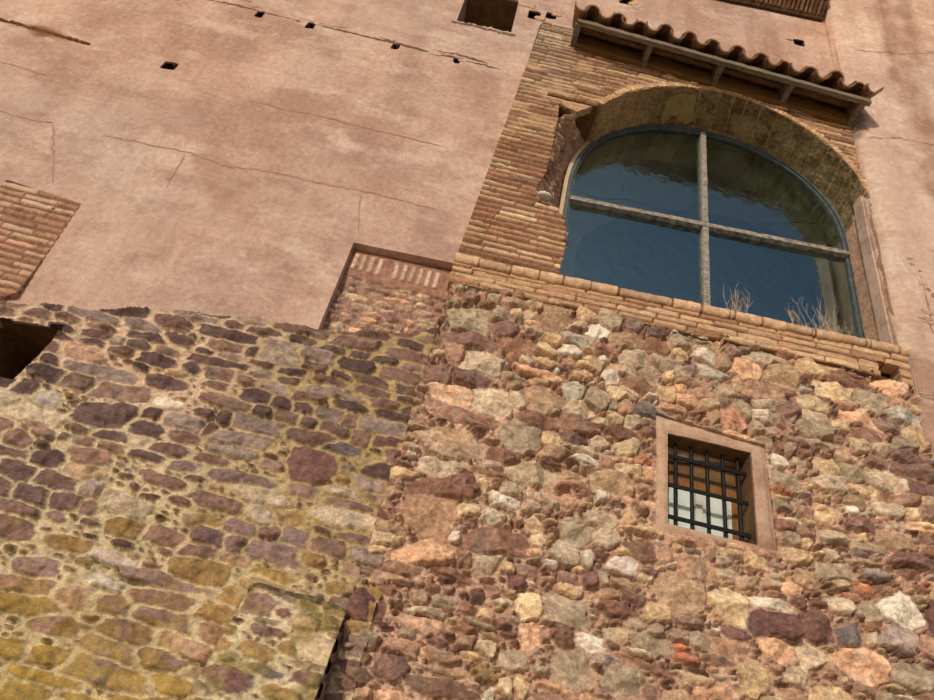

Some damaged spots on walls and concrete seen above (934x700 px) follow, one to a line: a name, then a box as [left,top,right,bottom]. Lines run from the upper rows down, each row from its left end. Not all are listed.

crack [0,18,90,45]
crack [0,61,46,75]
crack [0,109,55,183]
crack [104,134,436,232]
crack [916,271,934,332]